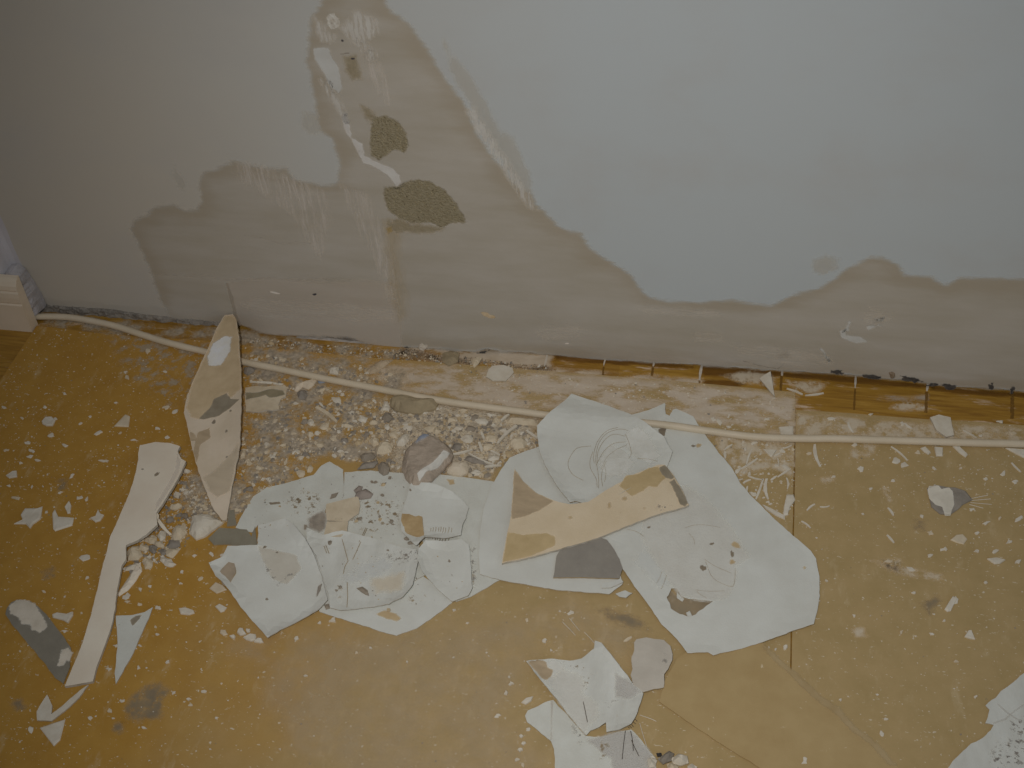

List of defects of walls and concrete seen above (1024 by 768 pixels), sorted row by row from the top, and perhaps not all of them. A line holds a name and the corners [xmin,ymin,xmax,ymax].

flaking render [40,0,1024,394]